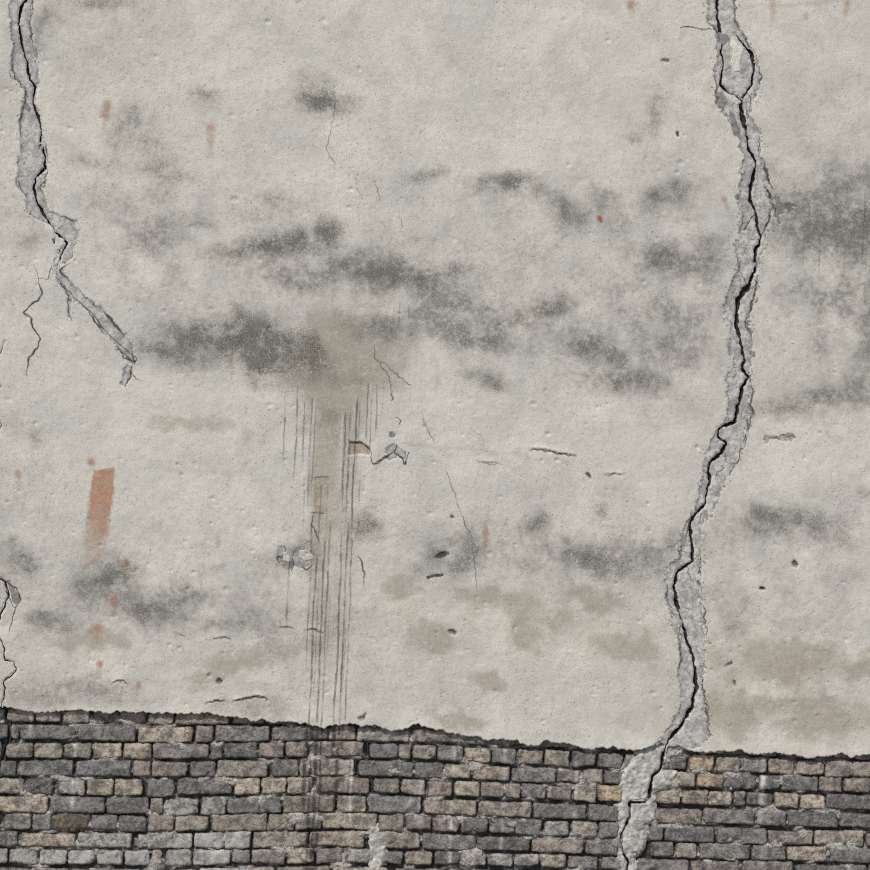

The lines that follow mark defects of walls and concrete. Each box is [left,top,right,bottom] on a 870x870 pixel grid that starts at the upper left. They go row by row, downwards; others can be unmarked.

crack [8,0,137,378]
leakage [228,222,339,256]
leakage [333,259,406,285]
flaking render [349,417,409,465]
crack [614,0,797,870]
corrosion [87,460,114,537]
leakage [142,309,402,870]
flaking render [276,546,316,571]
crack [0,577,21,777]
spalling [51,812,92,832]